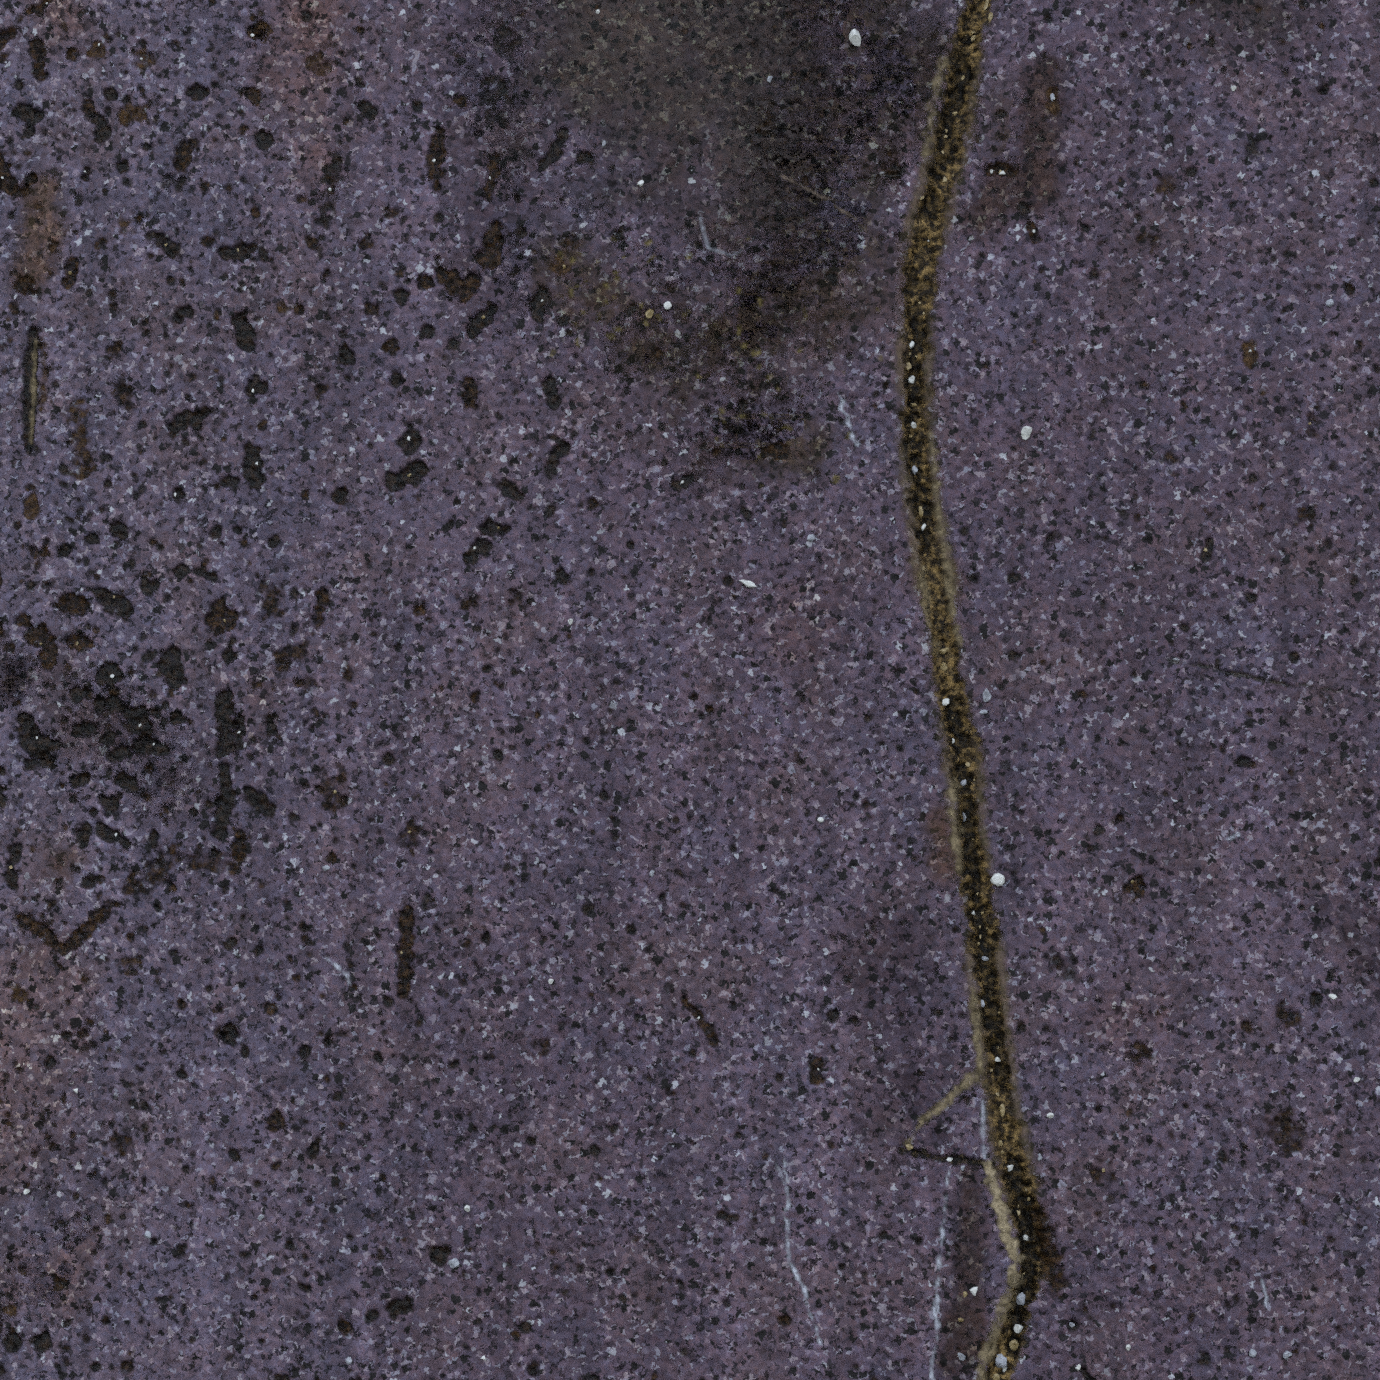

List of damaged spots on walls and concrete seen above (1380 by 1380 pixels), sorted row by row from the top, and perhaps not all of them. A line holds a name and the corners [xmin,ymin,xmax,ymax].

leakage [523,0,823,249]
crack [782,0,1068,1380]